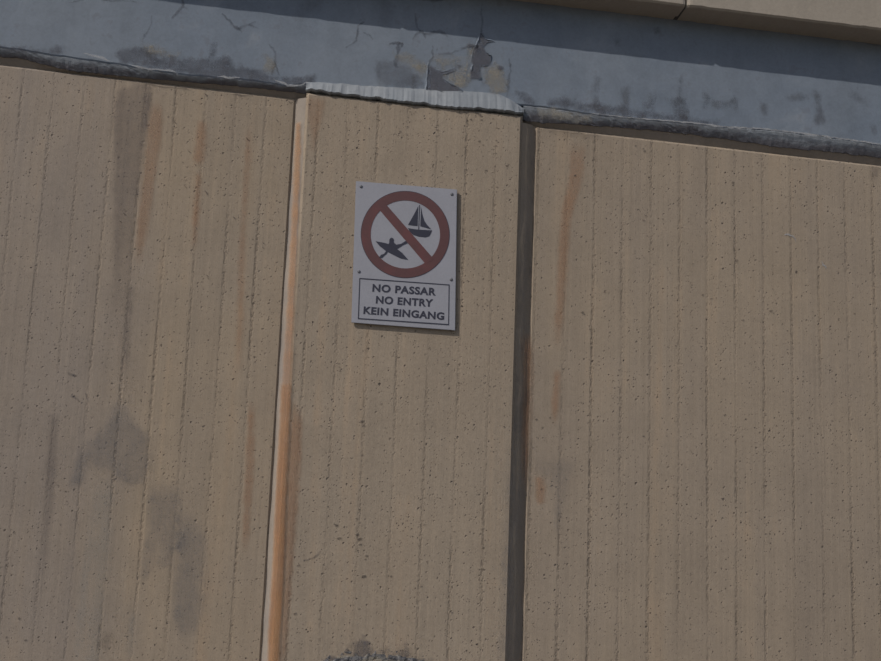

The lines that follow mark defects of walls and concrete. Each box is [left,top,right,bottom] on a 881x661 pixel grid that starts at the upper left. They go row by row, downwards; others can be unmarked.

peeling [425,32,502,92]
spalling [323,651,424,661]